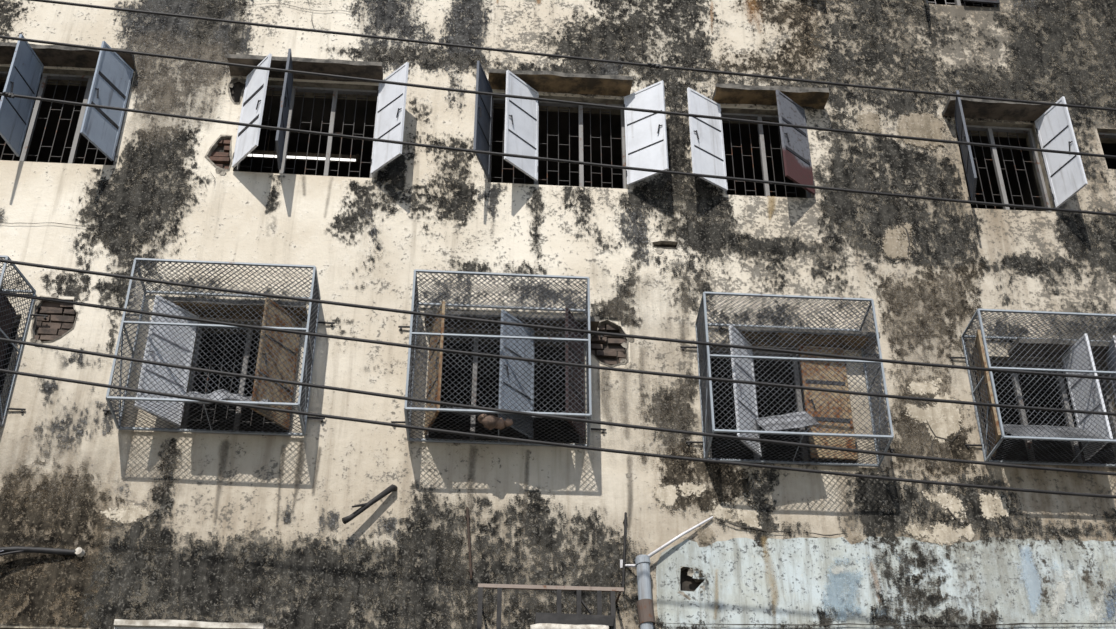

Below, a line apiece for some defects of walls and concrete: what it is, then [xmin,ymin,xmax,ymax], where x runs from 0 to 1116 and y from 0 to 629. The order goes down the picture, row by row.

leakage [0,0,35,42]
flaking render [205,135,232,175]
leakage [40,0,289,369]
flaking render [30,293,78,344]
flaking render [590,319,634,367]
leakage [319,0,1116,629]
leakage [0,371,810,629]
flaking render [676,564,707,601]